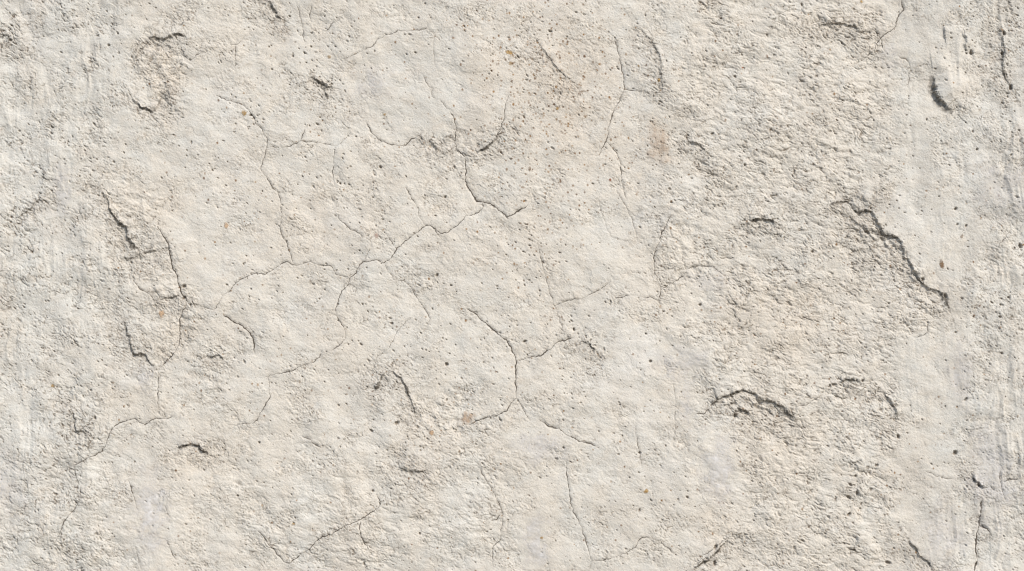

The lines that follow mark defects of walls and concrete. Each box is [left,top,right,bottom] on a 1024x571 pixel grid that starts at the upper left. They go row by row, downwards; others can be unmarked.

crack [600,41,657,197]
crack [61,226,187,530]
crack [216,96,526,424]
crack [468,218,721,446]
crack [258,498,381,563]
crack [566,467,671,561]